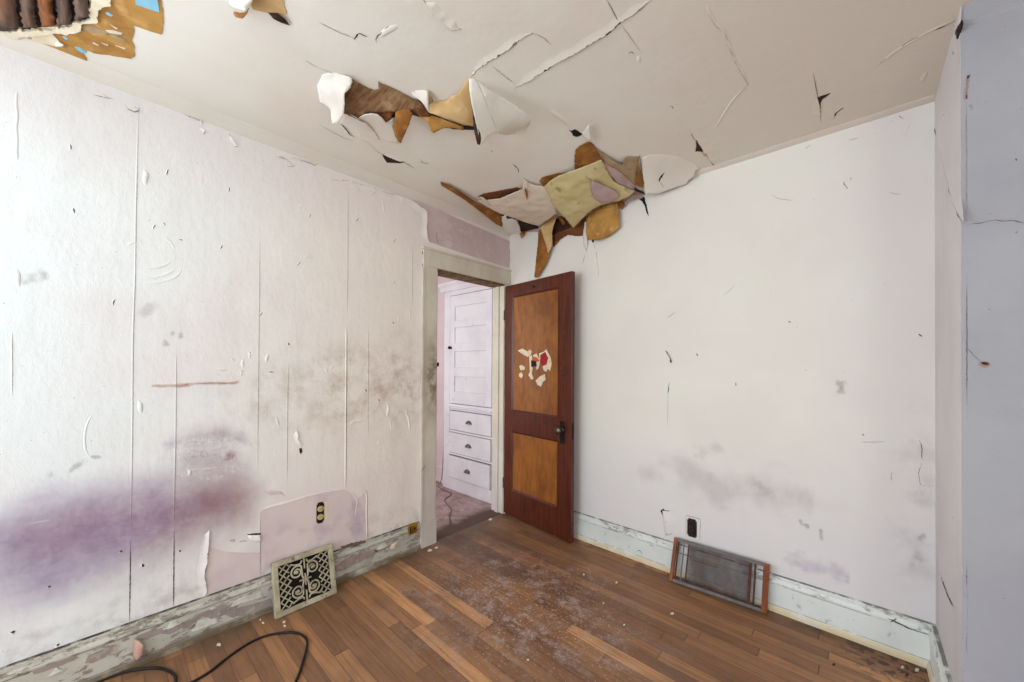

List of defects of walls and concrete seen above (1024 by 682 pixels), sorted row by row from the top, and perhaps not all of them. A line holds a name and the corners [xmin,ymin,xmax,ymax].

spalling [0,0,111,40]
crack [899,105,1023,224]
crack [963,288,971,386]
peeling [335,540,398,572]
peeling [31,592,273,676]
crack [941,566,968,663]